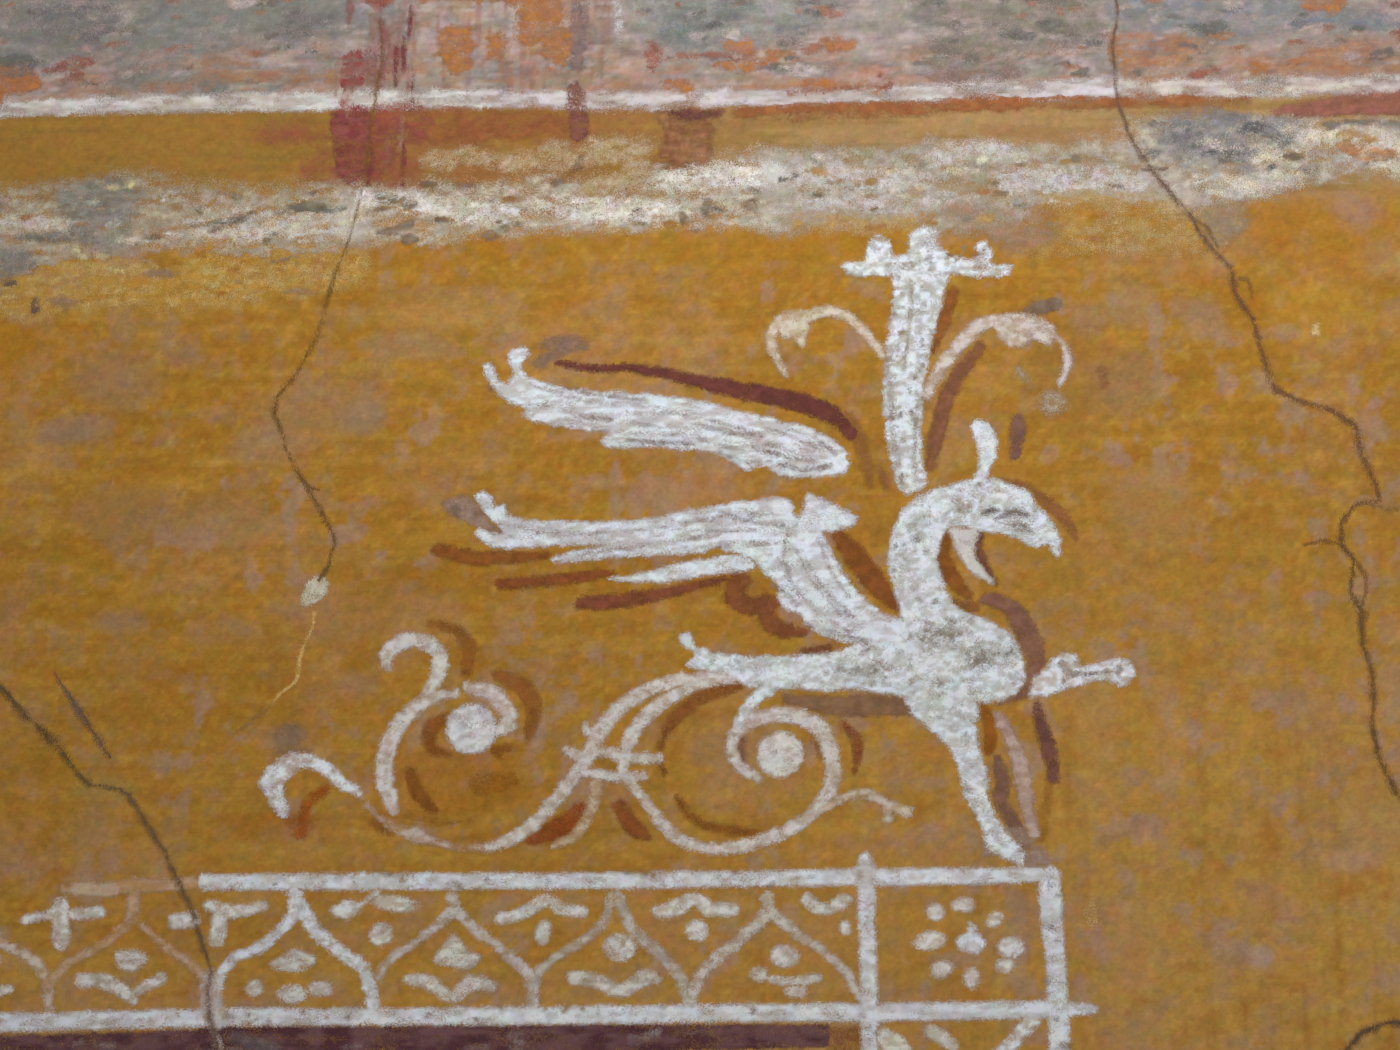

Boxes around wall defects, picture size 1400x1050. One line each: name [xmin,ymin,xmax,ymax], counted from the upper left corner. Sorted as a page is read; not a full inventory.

crack [232,20,385,735]
crack [1107,0,1400,802]
crack [0,672,281,1050]
crack [1342,1017,1400,1050]